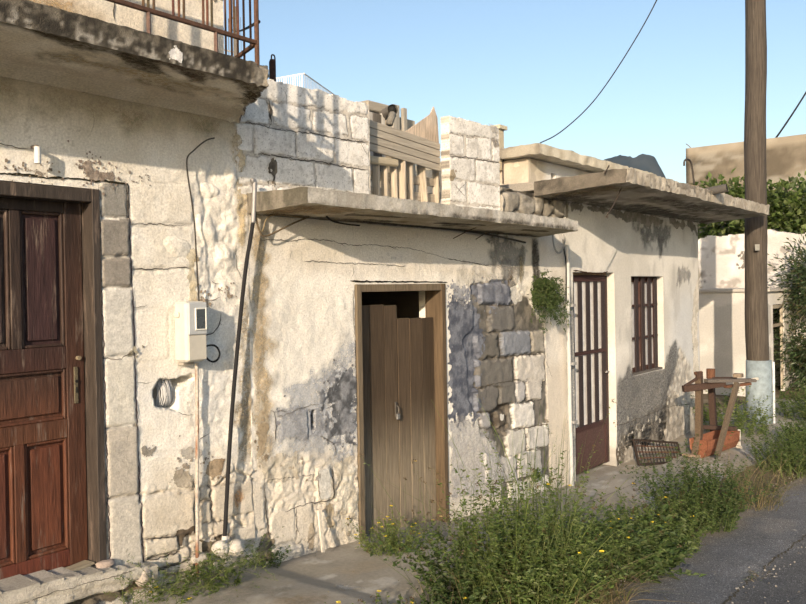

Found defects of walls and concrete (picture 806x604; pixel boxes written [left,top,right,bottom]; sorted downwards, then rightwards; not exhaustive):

leakage [35,31,216,95]
leakage [234,80,267,105]
peeling [4,158,64,185]
peeling [75,151,151,196]
leakage [253,227,268,263]
crack [264,239,538,406]
leakage [234,273,280,460]
peeling [446,277,525,445]
leakage [277,342,356,461]
peeling [254,359,359,545]
spalling [257,532,275,563]
crack [722,536,804,604]